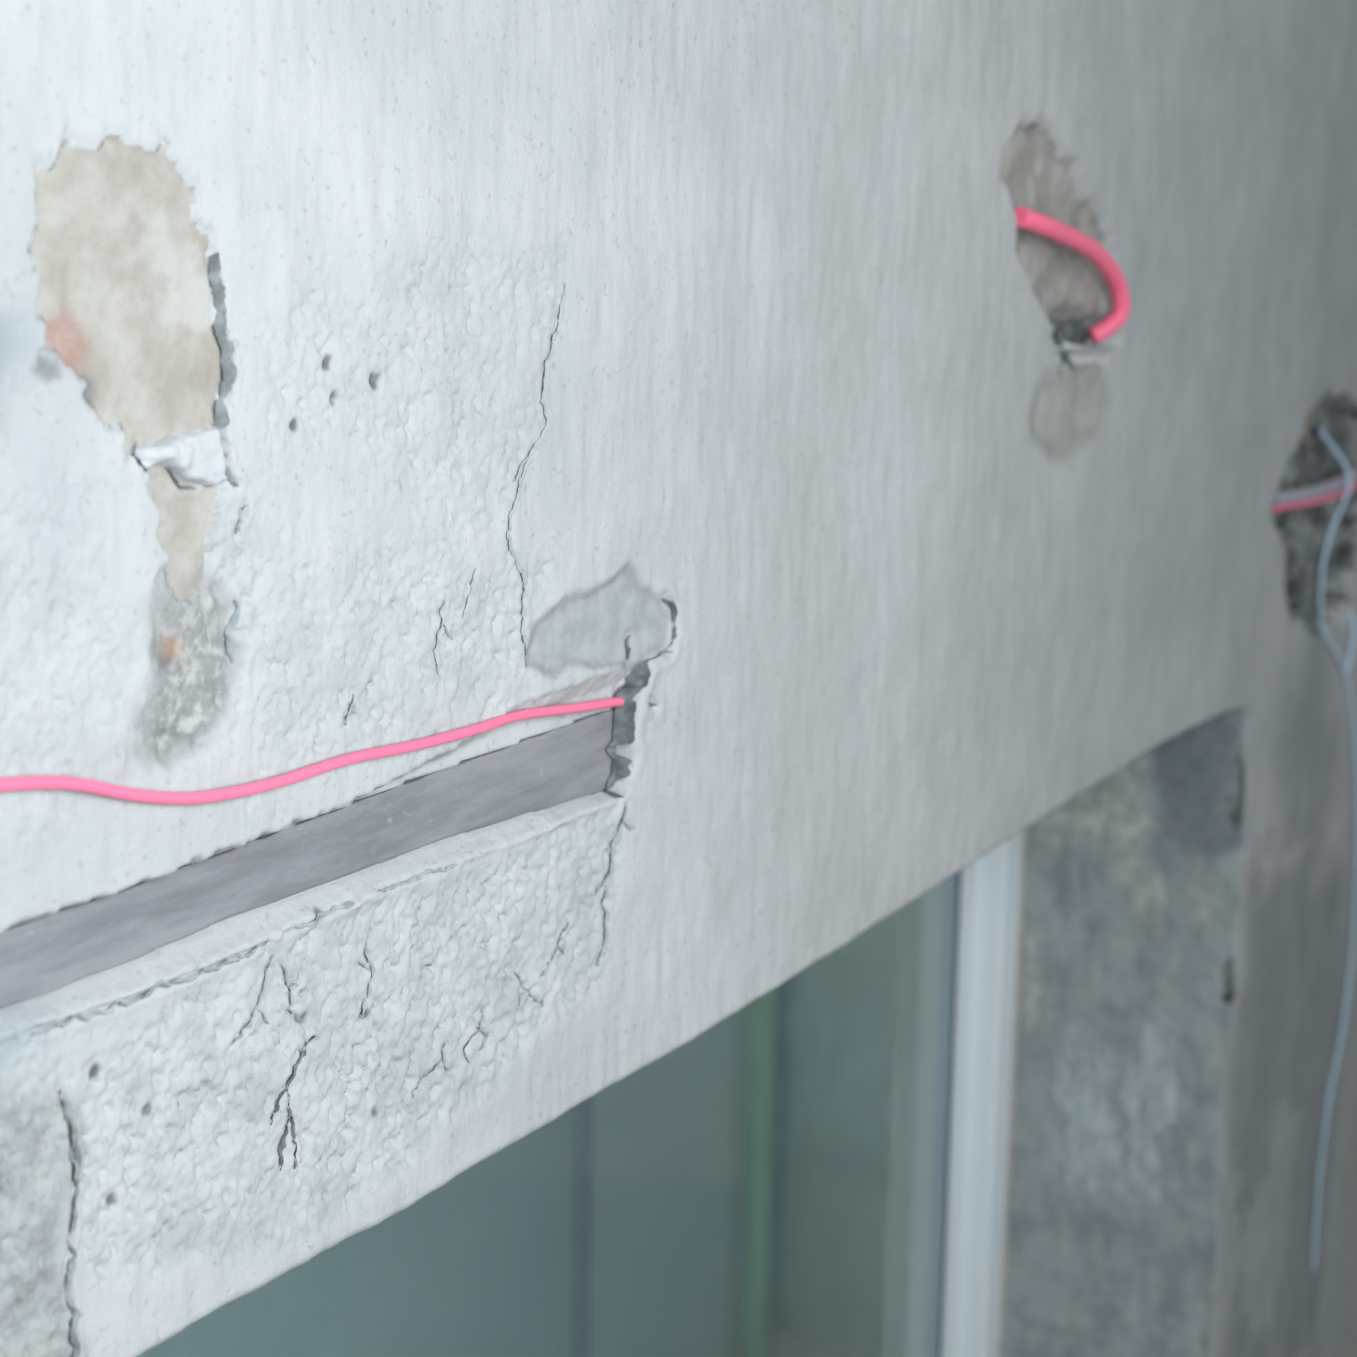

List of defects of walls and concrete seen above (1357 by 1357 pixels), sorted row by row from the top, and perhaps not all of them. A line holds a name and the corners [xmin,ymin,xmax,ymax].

spalling [1000,123,1107,245]
spalling [1016,227,1108,378]
spalling [30,135,239,761]
crack [433,569,477,674]
crack [507,283,567,667]
spalling [527,568,666,674]
spalling [1271,391,1357,637]
crack [32,864,458,1171]
peeling [1222,960,1237,1005]
crack [59,1090,82,1357]